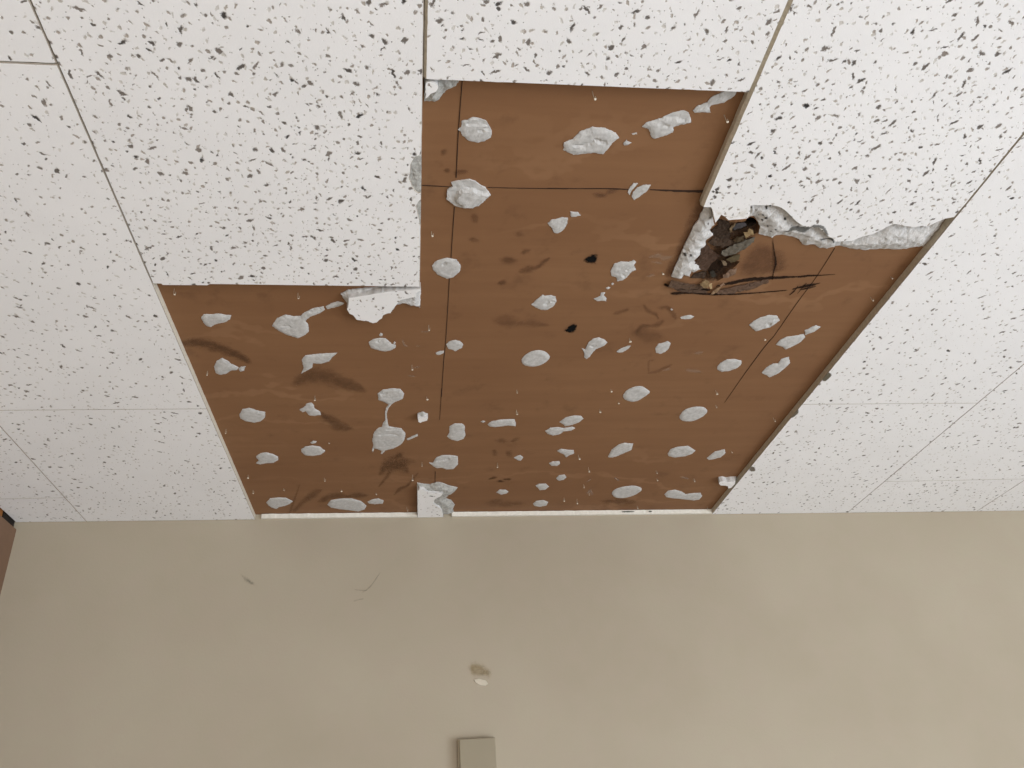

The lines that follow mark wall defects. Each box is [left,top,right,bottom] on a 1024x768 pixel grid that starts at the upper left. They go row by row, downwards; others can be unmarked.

spalling [409,155,422,225]
peeling [668,219,755,294]
crack [664,244,835,402]